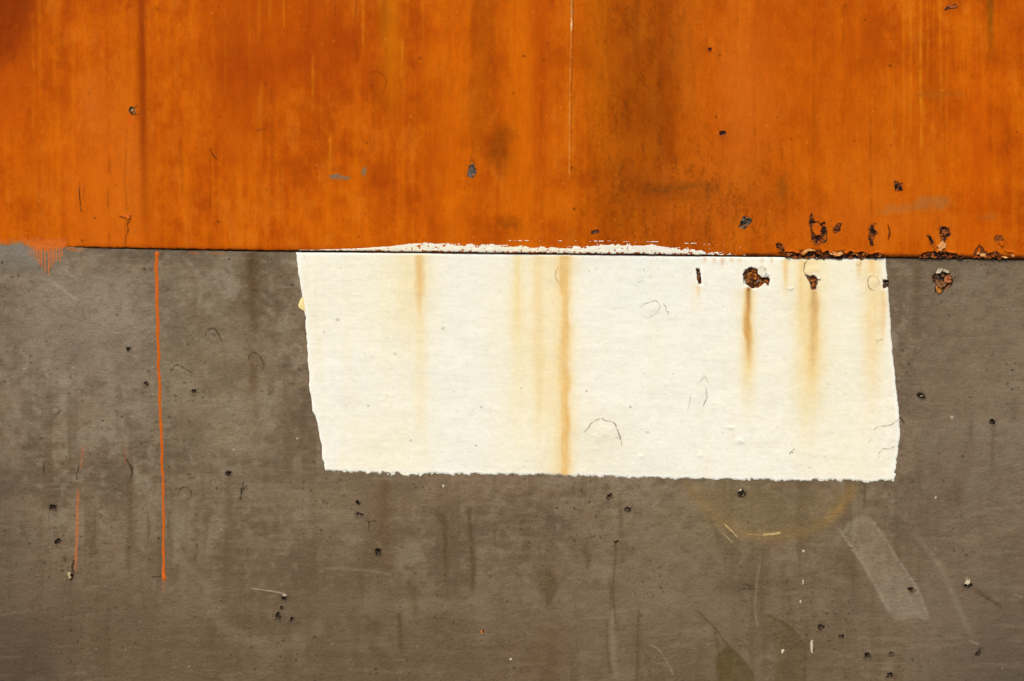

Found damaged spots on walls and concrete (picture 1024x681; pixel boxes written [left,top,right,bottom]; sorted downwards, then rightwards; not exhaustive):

rust [364,254,460,467]
rust [504,255,597,476]
rust [685,279,708,328]
rust [701,257,744,269]
rust [728,257,893,472]
peeling [742,211,1024,294]